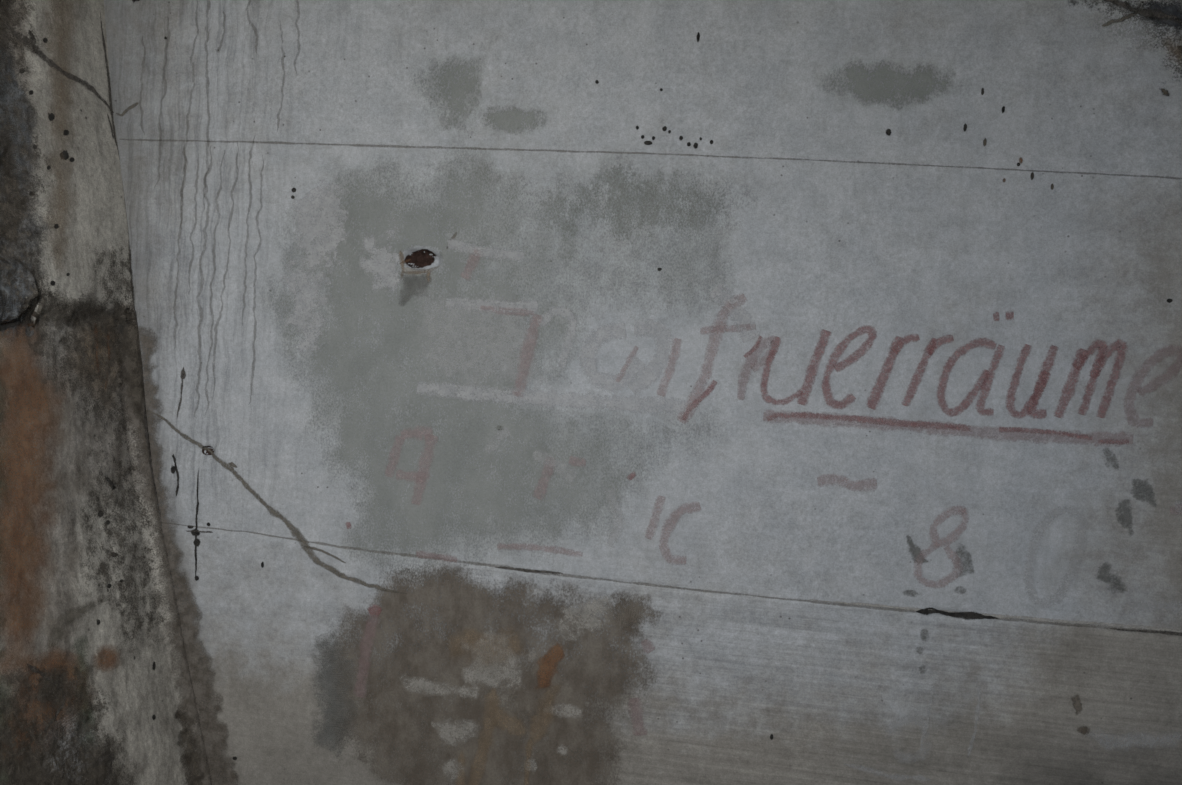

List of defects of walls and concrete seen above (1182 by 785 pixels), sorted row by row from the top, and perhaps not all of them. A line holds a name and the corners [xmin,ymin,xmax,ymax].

crack [1070,0,1182,78]
crack [4,13,138,310]
crack [146,410,407,594]
damp [317,566,659,785]